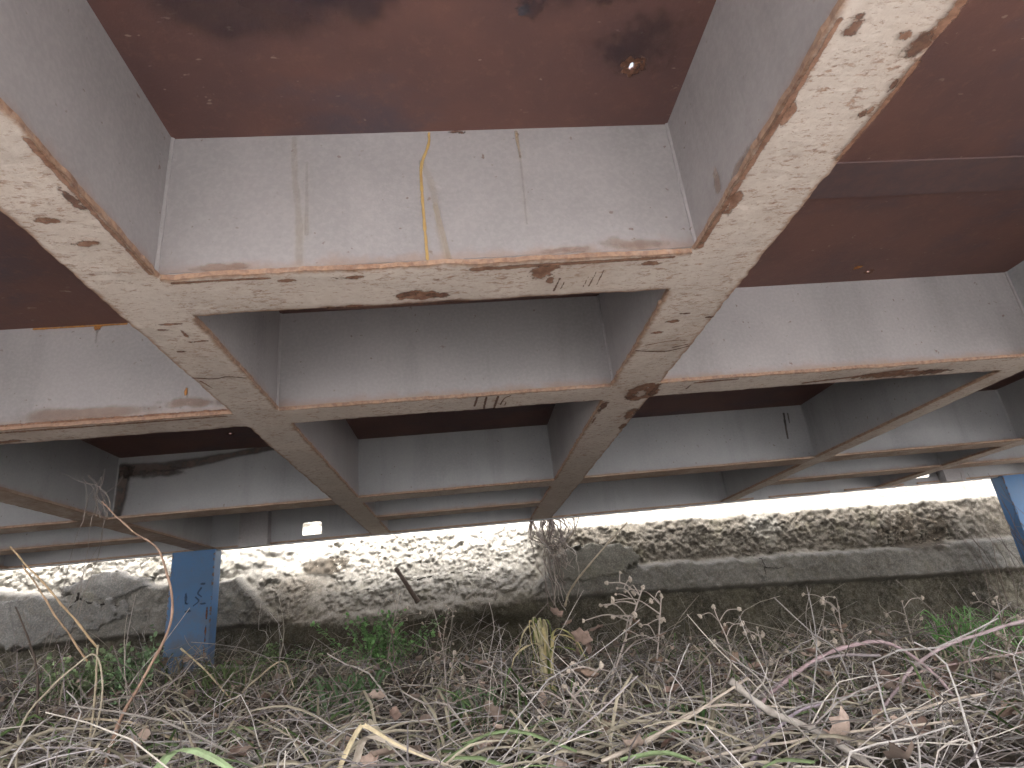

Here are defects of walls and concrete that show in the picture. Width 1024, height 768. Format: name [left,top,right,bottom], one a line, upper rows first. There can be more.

corrosion [420,132,430,260]